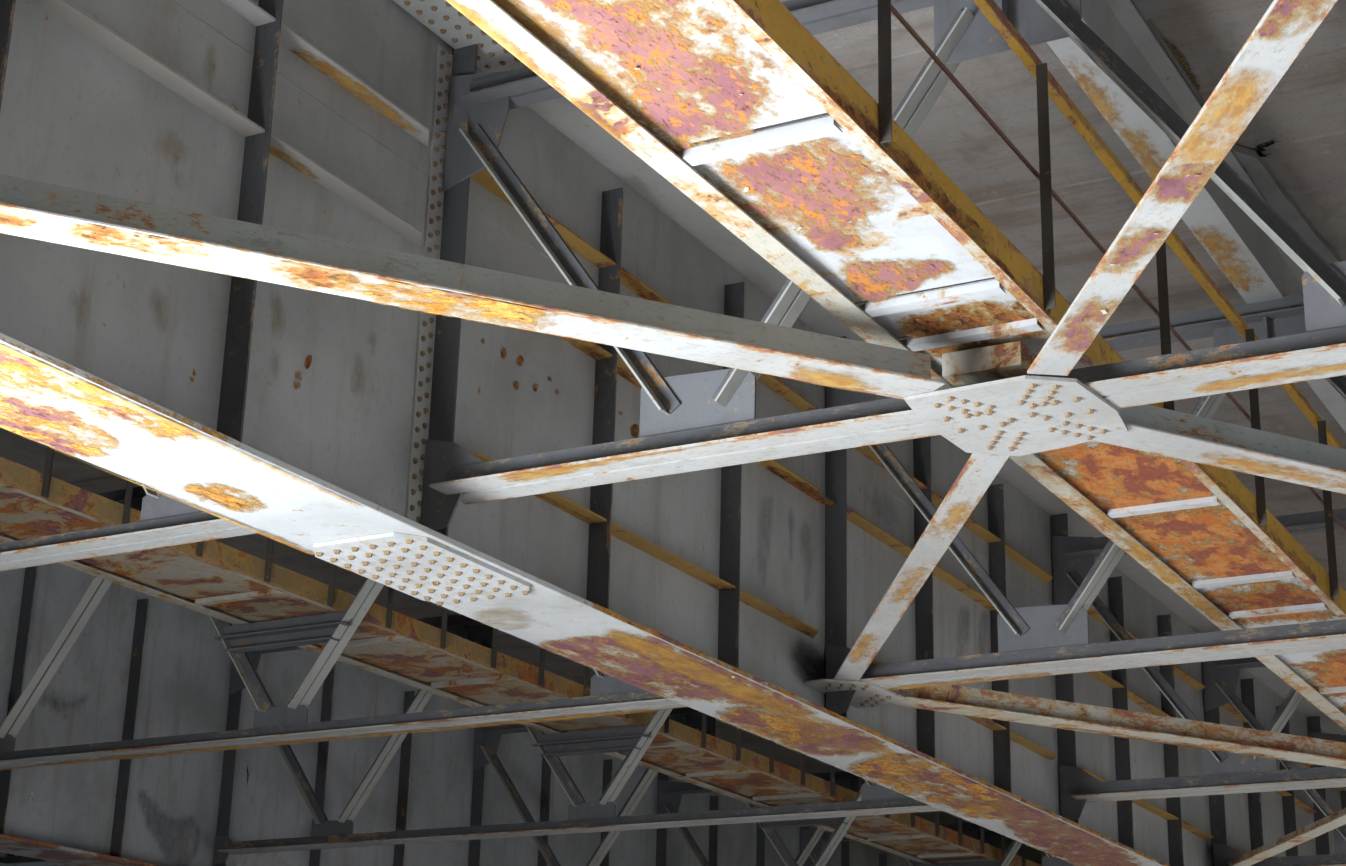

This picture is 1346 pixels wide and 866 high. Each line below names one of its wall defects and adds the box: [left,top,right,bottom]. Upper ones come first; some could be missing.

corrosion [1257,0,1327,40]
corrosion [447,0,633,151]
corrosion [1075,70,1264,204]
corrosion [0,209,37,228]
corrosion [65,220,209,260]
corrosion [1102,227,1167,272]
corrosion [272,261,555,329]
corrosion [1051,298,1121,355]
corrosion [0,340,359,507]
corrosion [1039,441,1346,626]
corrosion [1300,650,1346,712]
corrosion [0,602,1170,866]